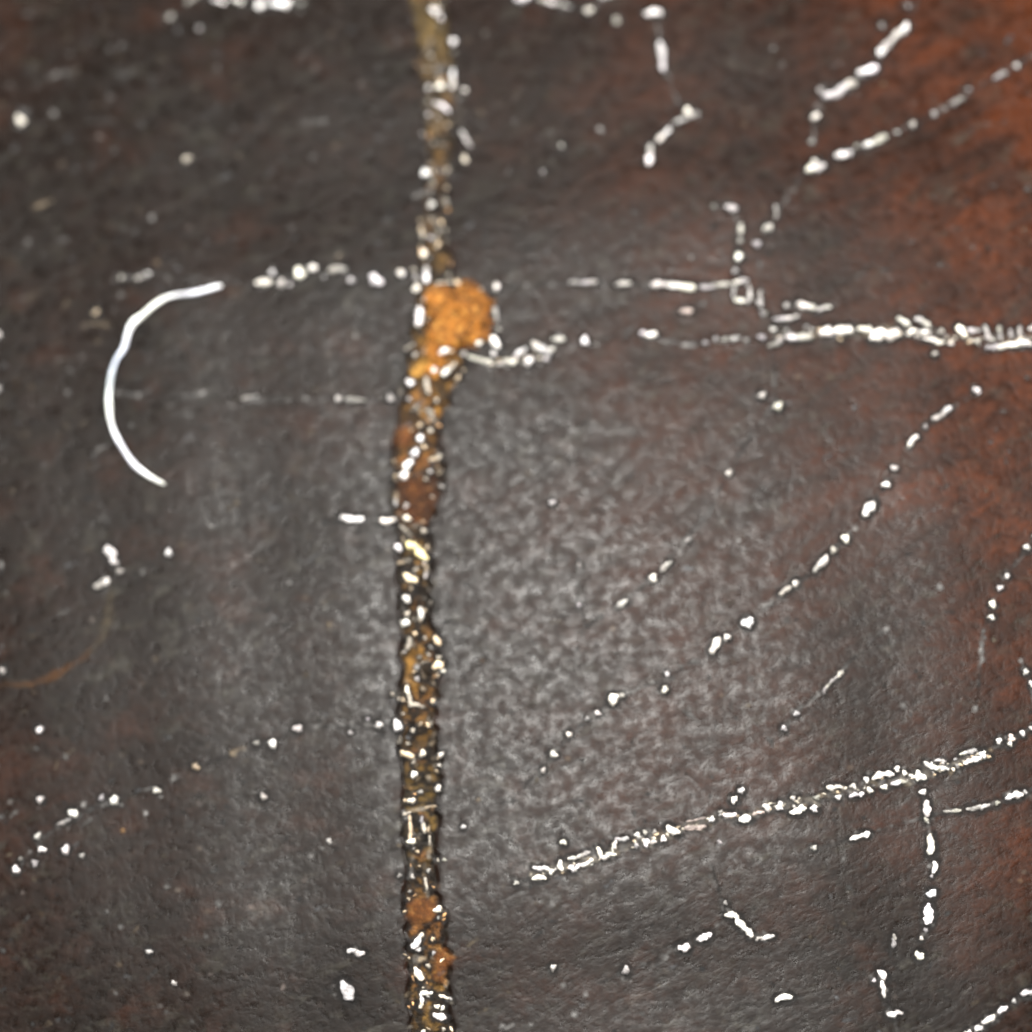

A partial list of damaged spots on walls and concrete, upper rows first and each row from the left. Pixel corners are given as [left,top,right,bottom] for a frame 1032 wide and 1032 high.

crack [166,0,305,23]
crack [117,271,211,282]
crack [180,390,219,399]
crack [235,0,1032,1032]
crack [144,753,234,815]
crack [10,793,123,877]